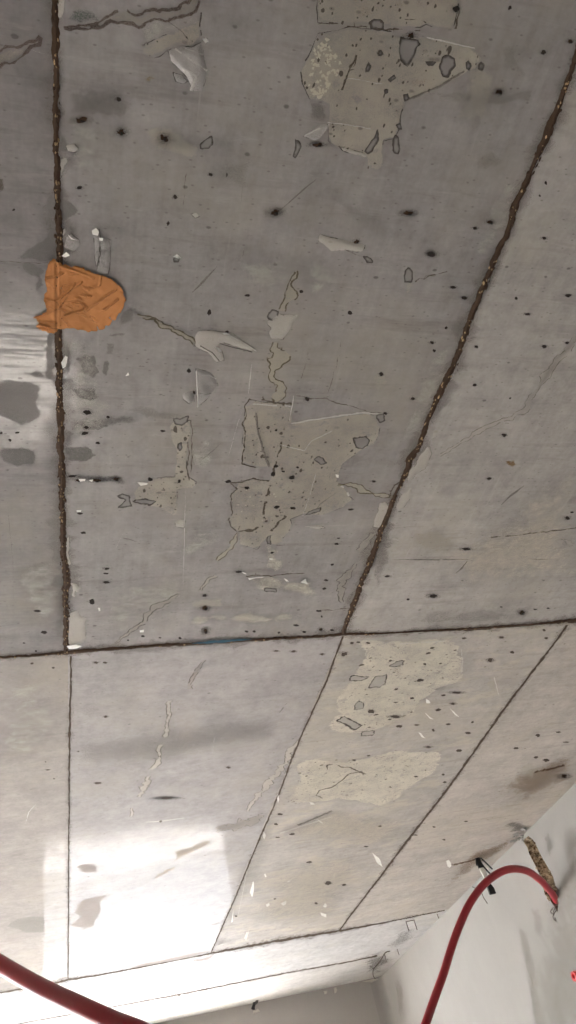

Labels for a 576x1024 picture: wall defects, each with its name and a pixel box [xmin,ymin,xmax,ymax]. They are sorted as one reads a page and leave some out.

crack [0,0,200,68]
spalling [399,37,485,78]
spalling [338,131,379,157]
spalling [392,123,402,154]
peeling [195,330,256,362]
damp [0,308,185,485]
crack [440,334,576,456]
peeling [117,416,197,528]
peeling [329,637,467,736]
peeling [288,746,447,806]